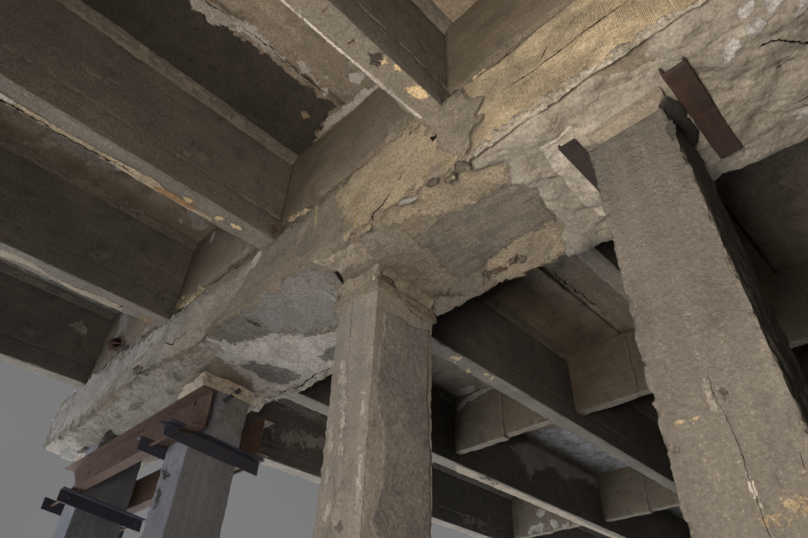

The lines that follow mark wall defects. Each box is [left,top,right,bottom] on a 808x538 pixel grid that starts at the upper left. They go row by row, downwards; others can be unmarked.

peeling [737,0,784,38]
peeling [722,37,742,63]
crack [760,39,808,69]
peeling [280,0,707,187]
peeling [0,93,165,193]
peeling [0,250,123,310]
crack [552,270,603,311]
corrosion [107,312,131,353]
peeling [46,250,263,461]
spalling [250,365,333,412]